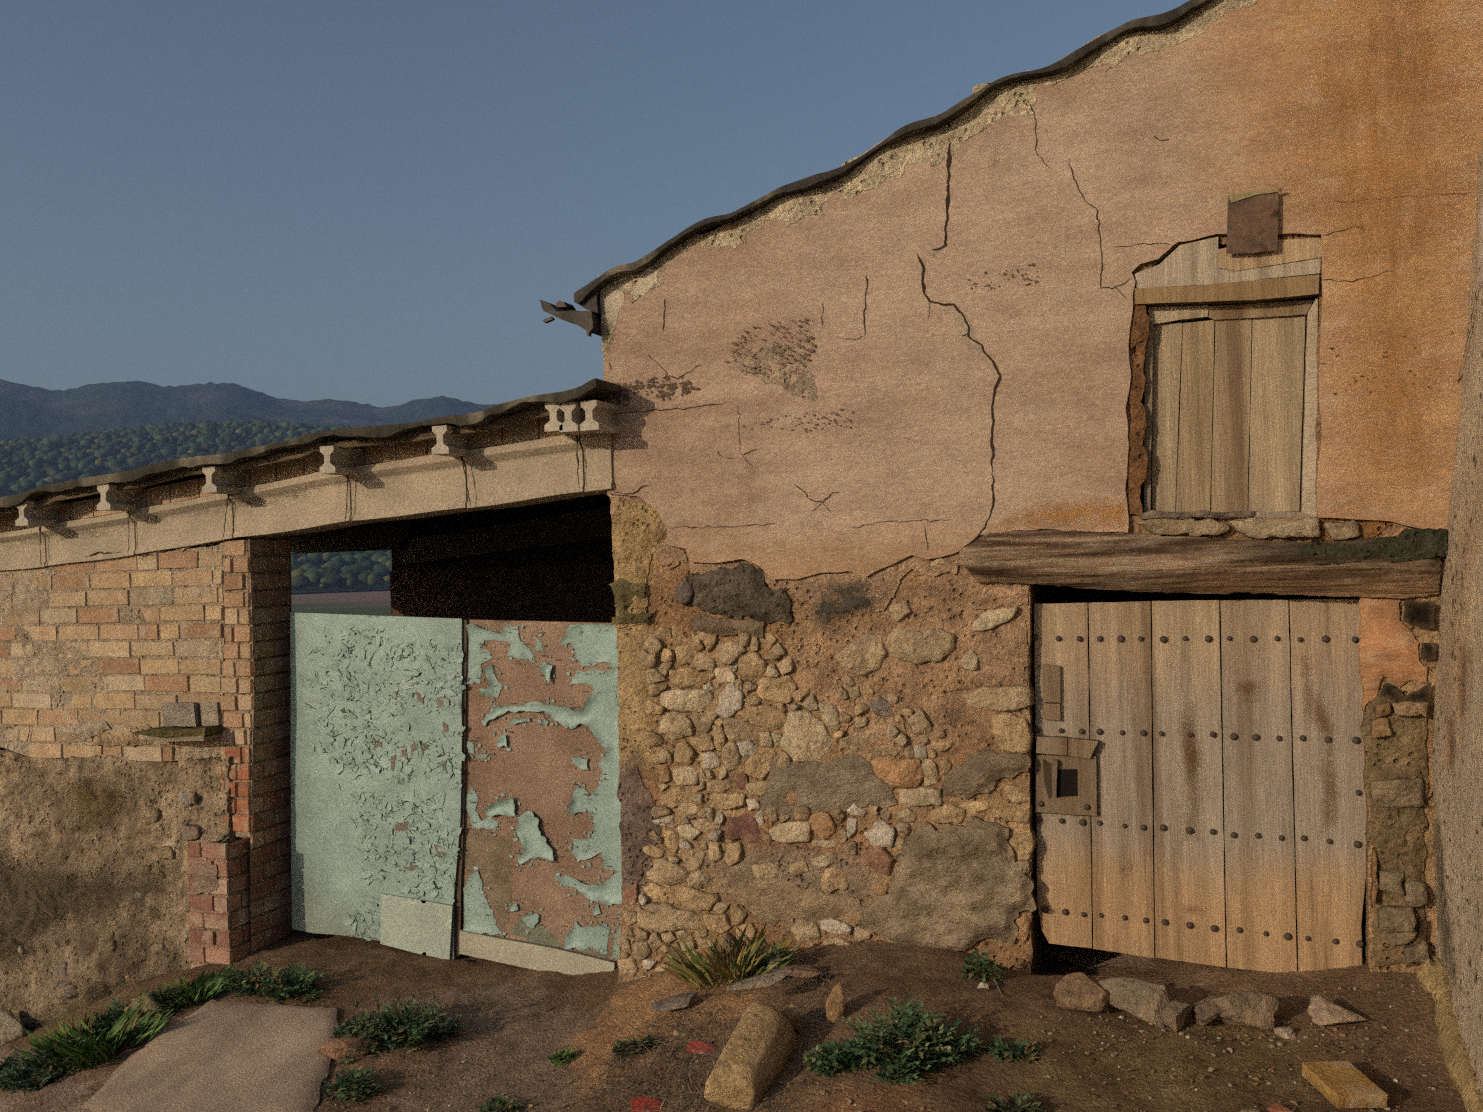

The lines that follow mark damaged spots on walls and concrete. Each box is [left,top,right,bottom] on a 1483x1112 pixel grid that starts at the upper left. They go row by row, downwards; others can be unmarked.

crack [1030,104,1171,299]
crack [794,123,1001,550]
flaking render [606,494,647,515]
crack [667,523,775,559]
peeling [305,527,1037,979]